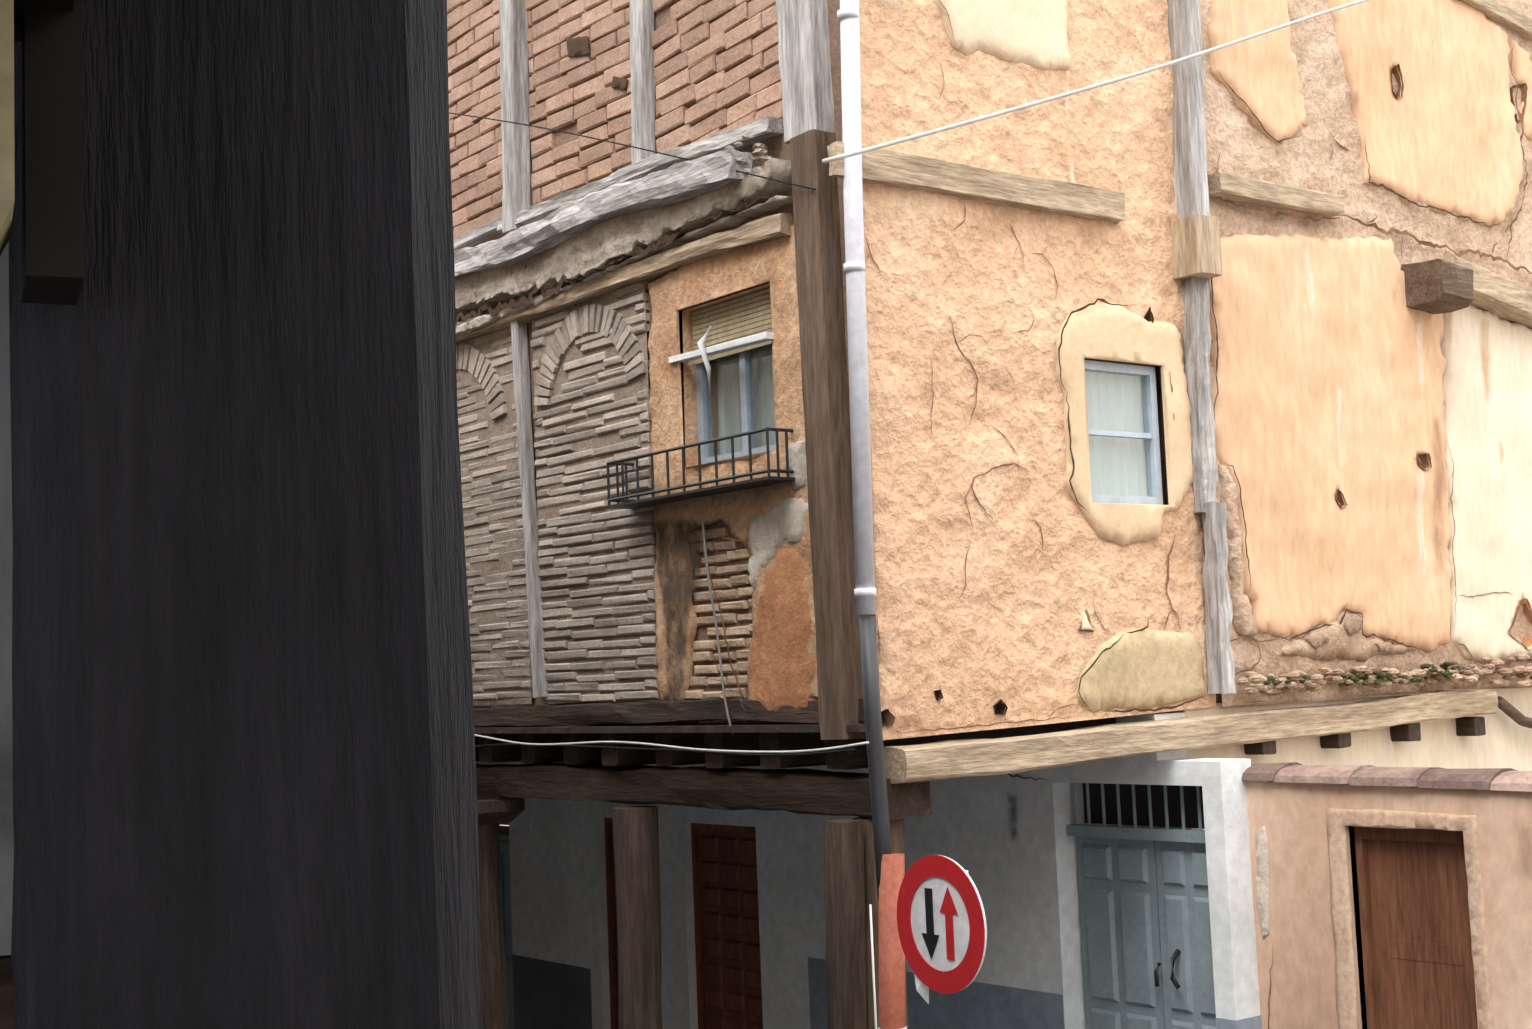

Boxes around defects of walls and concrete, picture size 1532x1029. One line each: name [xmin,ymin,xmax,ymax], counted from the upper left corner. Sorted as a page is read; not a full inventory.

crack [1215,41,1532,274]
spalling [1390,64,1404,99]
spalling [1510,83,1528,124]
flaking render [684,527,818,724]
crack [926,227,1128,599]
crack [889,496,1207,733]
crack [1211,278,1219,421]
crack [1224,462,1251,593]
spalling [1335,489,1347,509]
flaking render [1281,610,1411,662]
crack [1230,430,1532,675]
spalling [1416,453,1432,471]